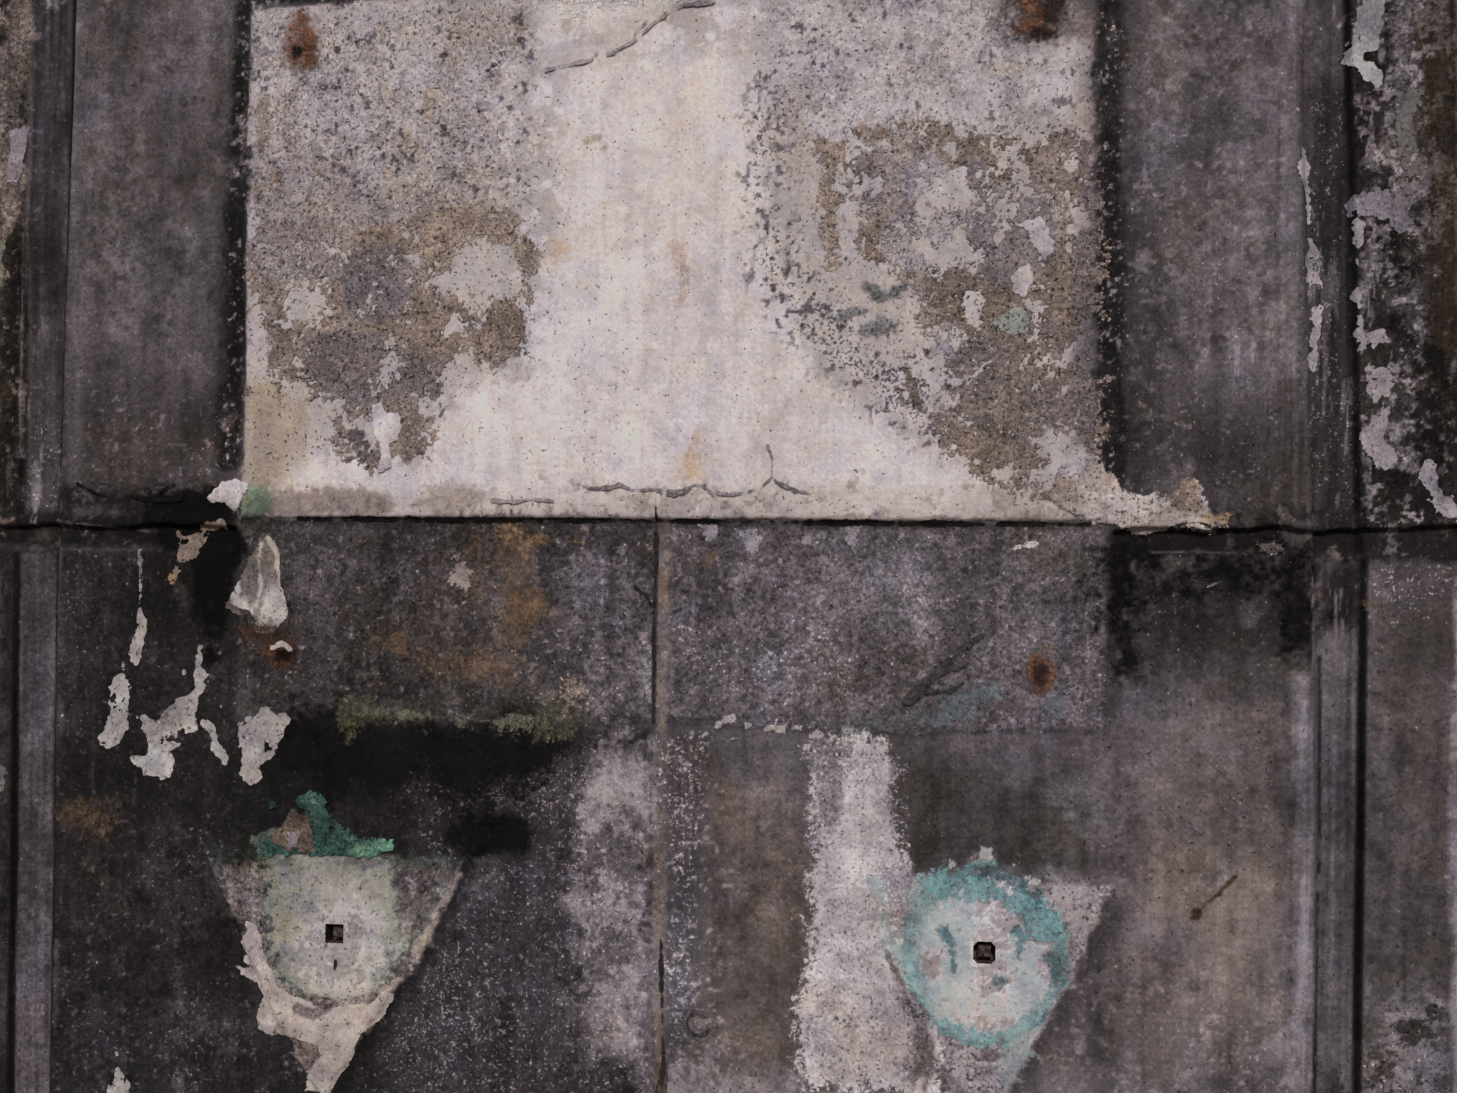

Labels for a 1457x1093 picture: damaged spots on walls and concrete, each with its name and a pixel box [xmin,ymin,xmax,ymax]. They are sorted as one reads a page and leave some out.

corrosion [281,7,318,72]
corrosion [1012,0,1069,42]
peeling [1341,0,1430,267]
flaking render [242,163,545,480]
flaking render [811,113,1234,535]
peeling [1350,287,1398,470]
peeling [168,478,248,585]
peeling [1418,459,1457,518]
peeling [98,535,291,785]
corrosion [238,617,297,669]
corrosion [1027,653,1055,695]
damp [252,674,598,863]